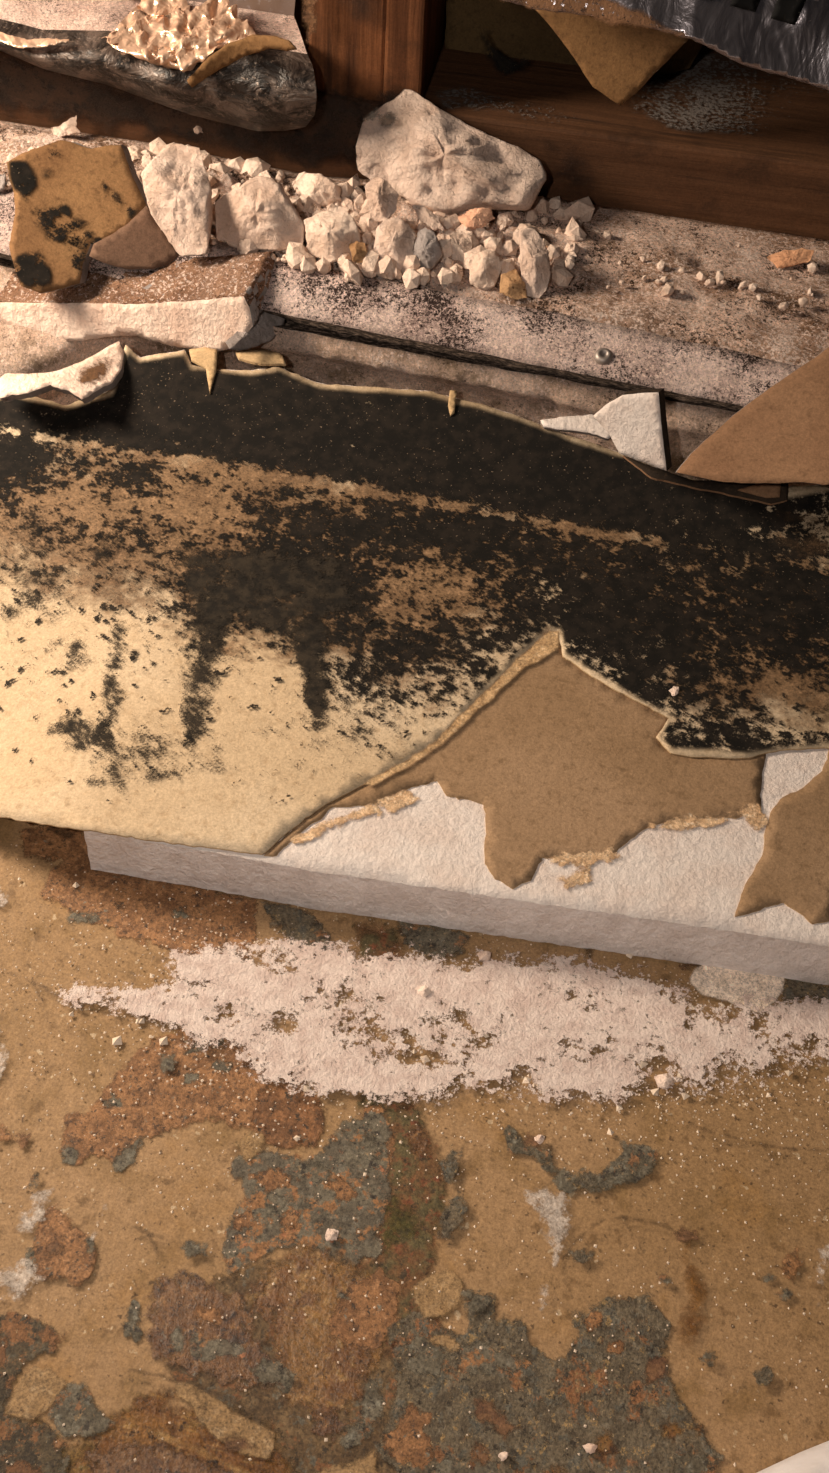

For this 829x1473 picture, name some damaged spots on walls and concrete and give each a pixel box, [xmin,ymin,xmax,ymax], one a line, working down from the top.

water stain [0,353,829,801]
peeling [398,921,470,958]
water stain [357,1090,447,1357]